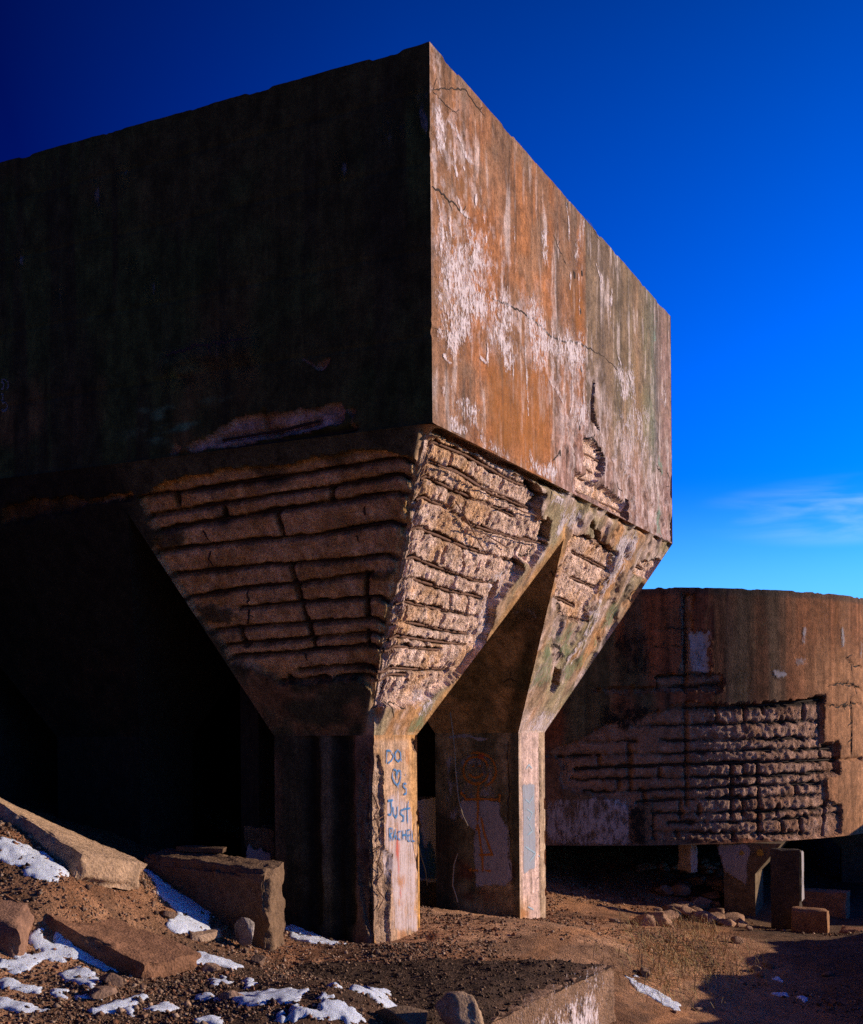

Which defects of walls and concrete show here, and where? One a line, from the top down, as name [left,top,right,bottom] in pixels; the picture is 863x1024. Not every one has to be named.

efflorescence [420,106,477,176]
crack [432,186,469,219]
crack [433,71,486,122]
efflorescence [435,194,589,435]
crack [497,300,625,377]
spalling [574,383,629,522]
spalling [130,430,552,711]
spalling [545,592,844,842]